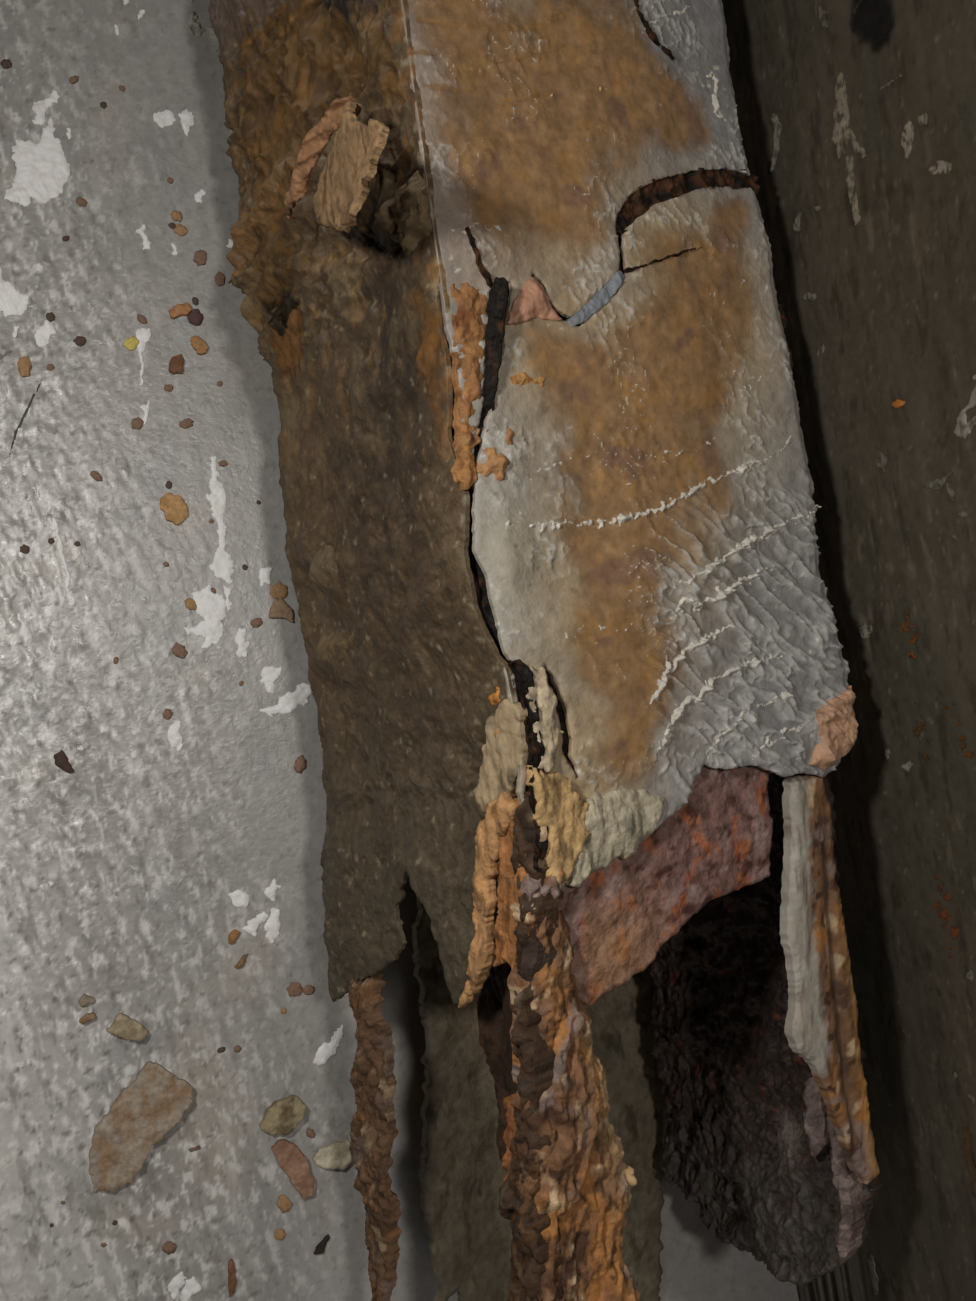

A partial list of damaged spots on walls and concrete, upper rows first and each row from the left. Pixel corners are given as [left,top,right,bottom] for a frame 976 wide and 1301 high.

leakage [853,0,891,47]
corrosion [430,0,701,226]
peeling [136,224,151,250]
peeling [194,189,206,203]
crack [615,167,760,274]
corrosion [267,303,303,376]
corrosion [417,297,442,422]
corrosion [537,243,744,764]
crack [442,227,575,872]
peeling [487,686,500,705]
peeling [809,685,859,770]